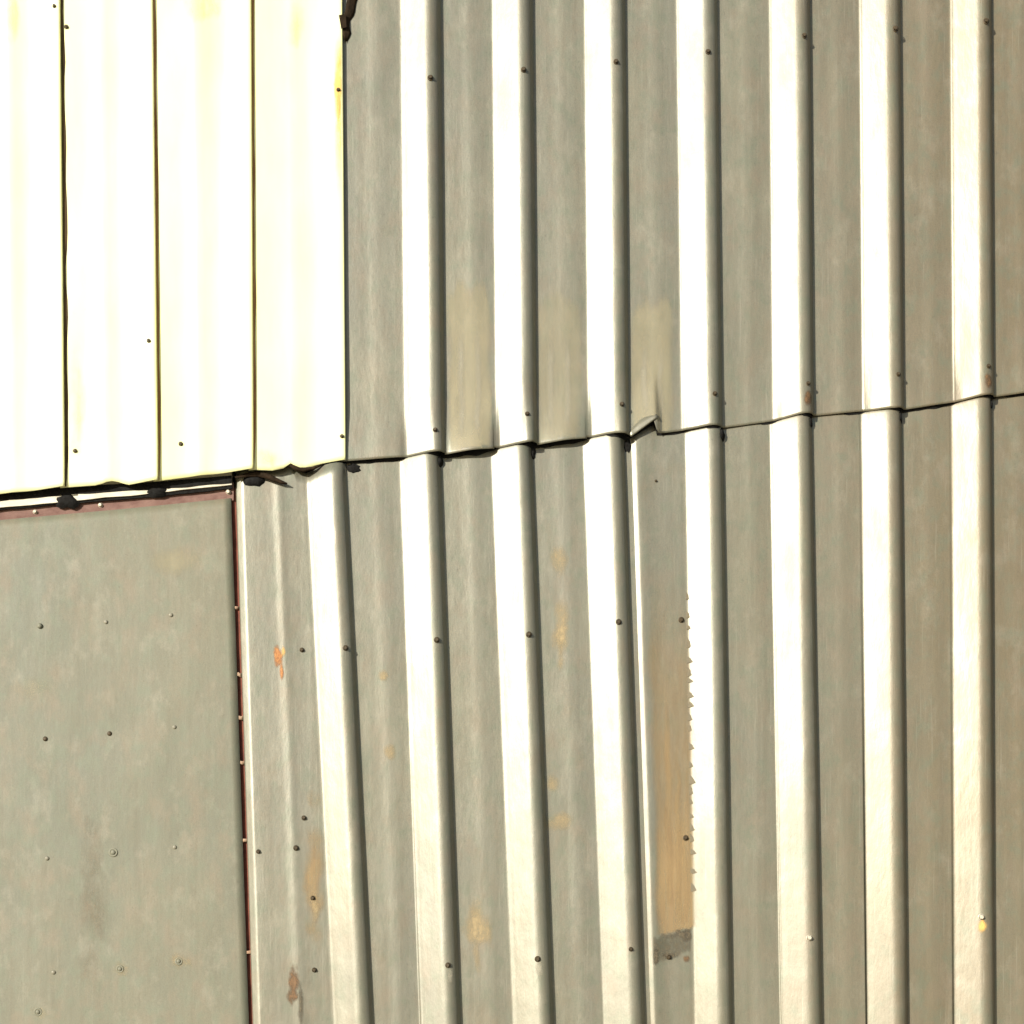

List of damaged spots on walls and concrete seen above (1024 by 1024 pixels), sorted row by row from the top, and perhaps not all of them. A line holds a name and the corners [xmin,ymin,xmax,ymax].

rust [274,647,284,678]
rust [658,791,693,933]
rust [288,968,302,1016]